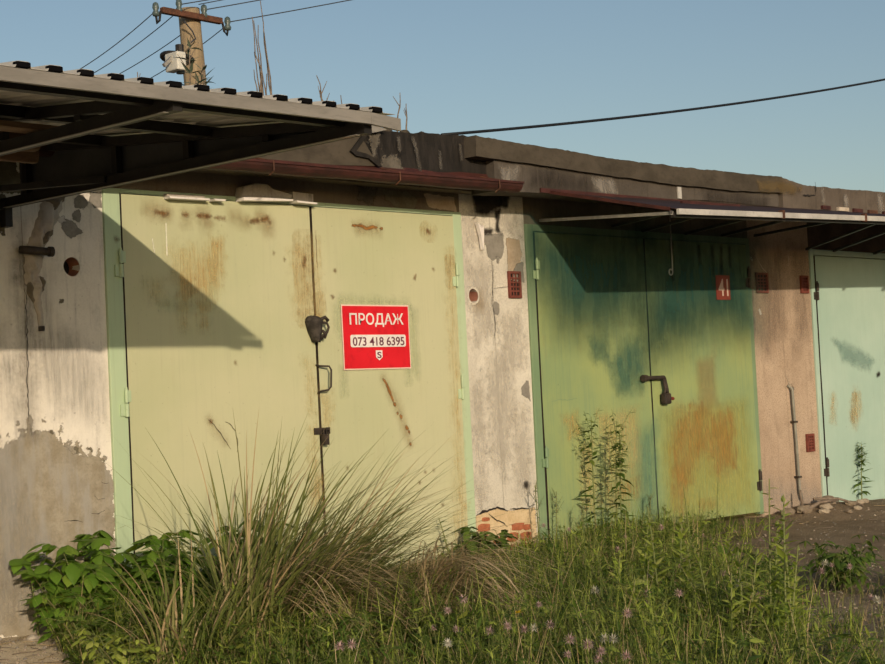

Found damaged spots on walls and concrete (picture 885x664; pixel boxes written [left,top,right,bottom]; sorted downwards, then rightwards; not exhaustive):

peeling [61,195,88,238]
crack [22,290,30,418]
spalling [0,415,116,637]
spalling [476,507,537,554]